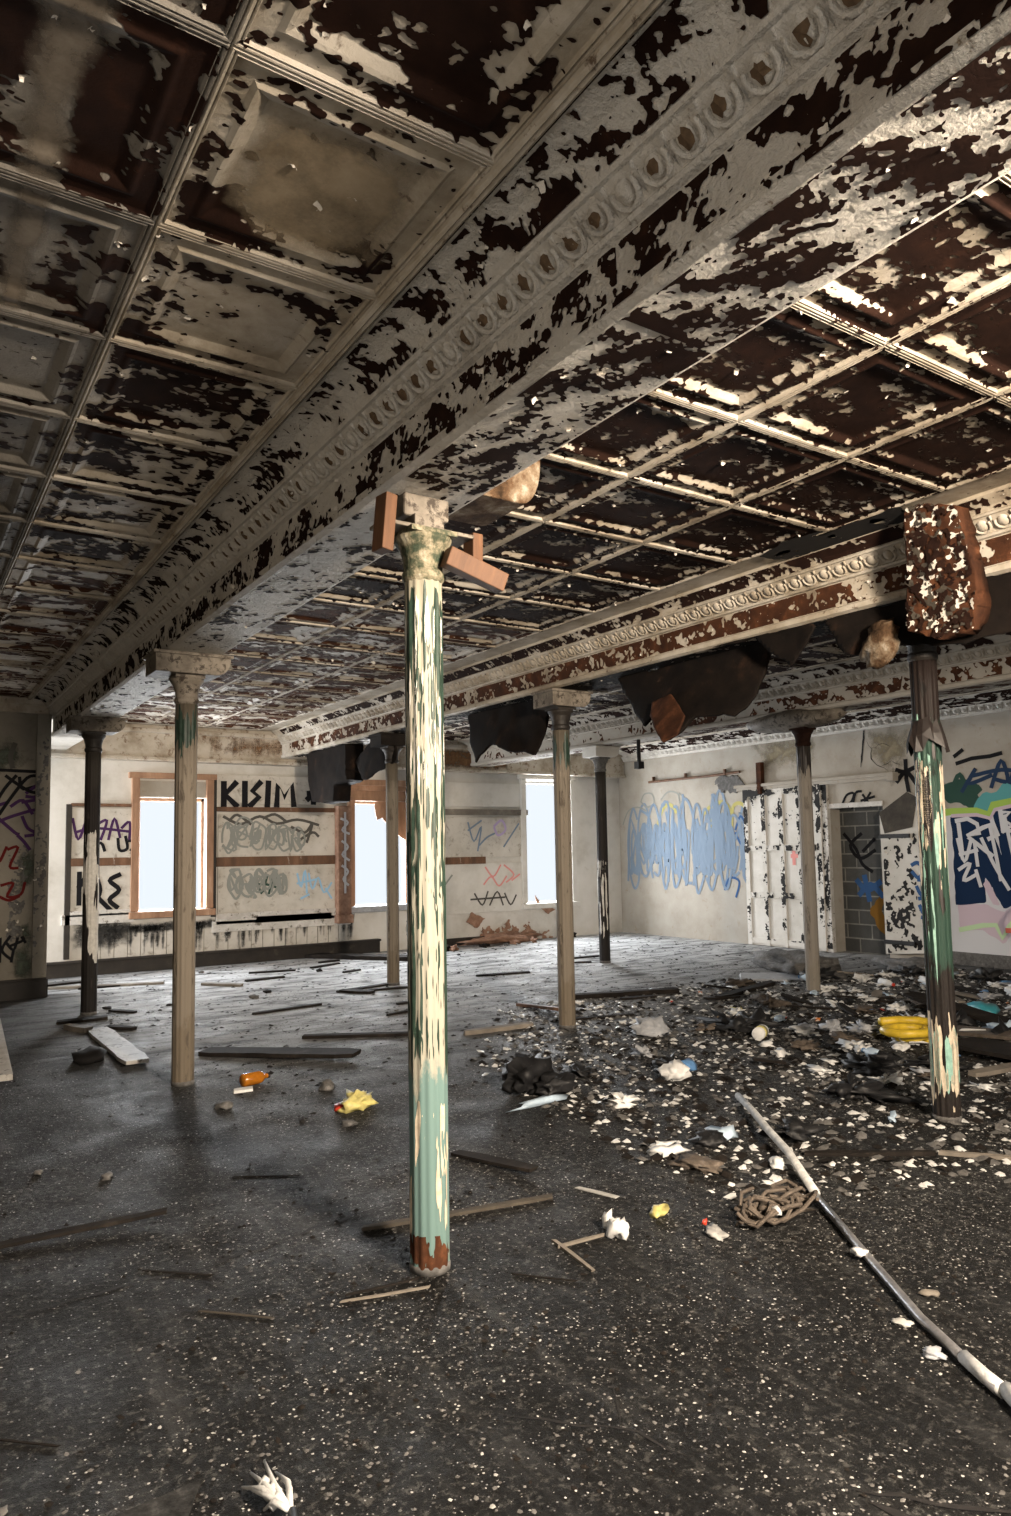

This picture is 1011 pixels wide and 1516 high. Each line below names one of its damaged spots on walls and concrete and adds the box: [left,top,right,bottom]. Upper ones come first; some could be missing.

leakage [235,127,401,258]
peeling [0,987,1011,1516]